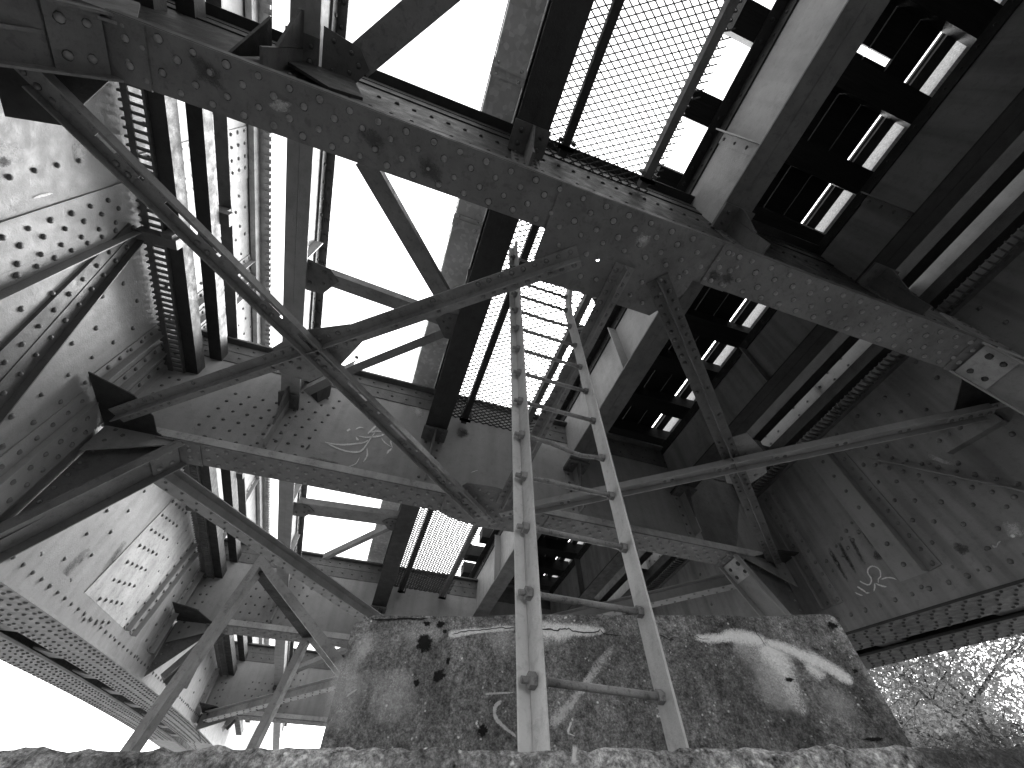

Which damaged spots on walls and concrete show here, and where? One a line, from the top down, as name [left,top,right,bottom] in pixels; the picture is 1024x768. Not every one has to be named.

crack [543,628,622,636]